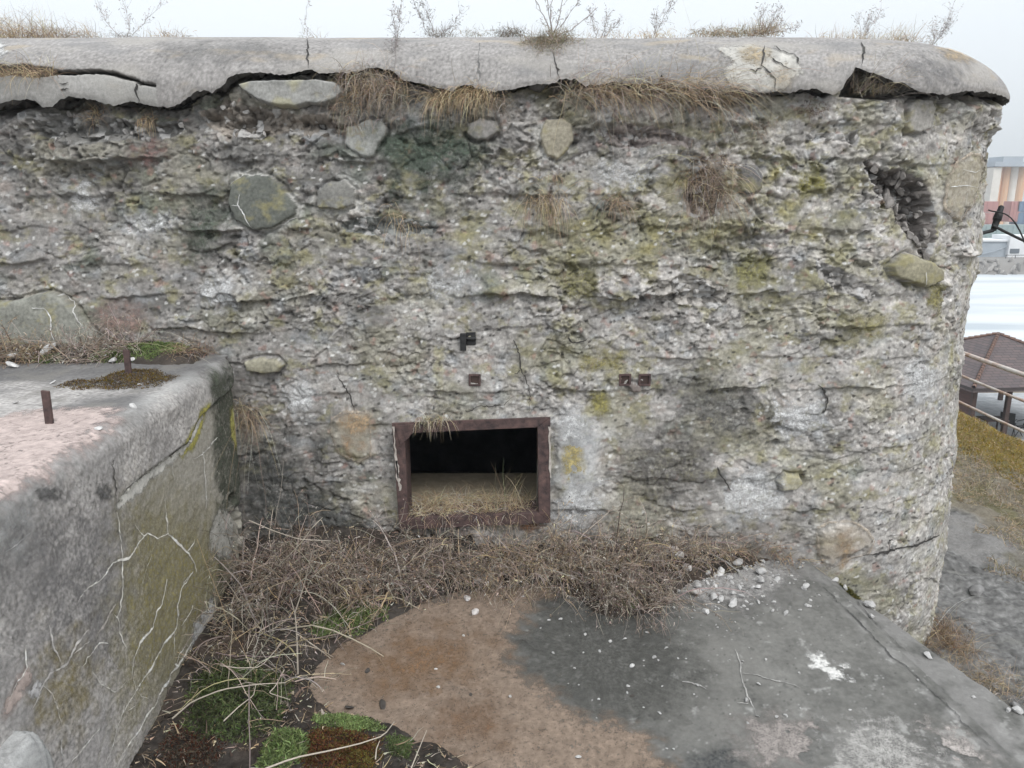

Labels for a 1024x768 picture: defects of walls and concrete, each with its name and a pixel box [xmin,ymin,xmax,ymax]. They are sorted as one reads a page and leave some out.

crack [750,45,799,86]
spalling [863,152,984,261]
crack [14,398,221,767]
crack [863,535,939,556]